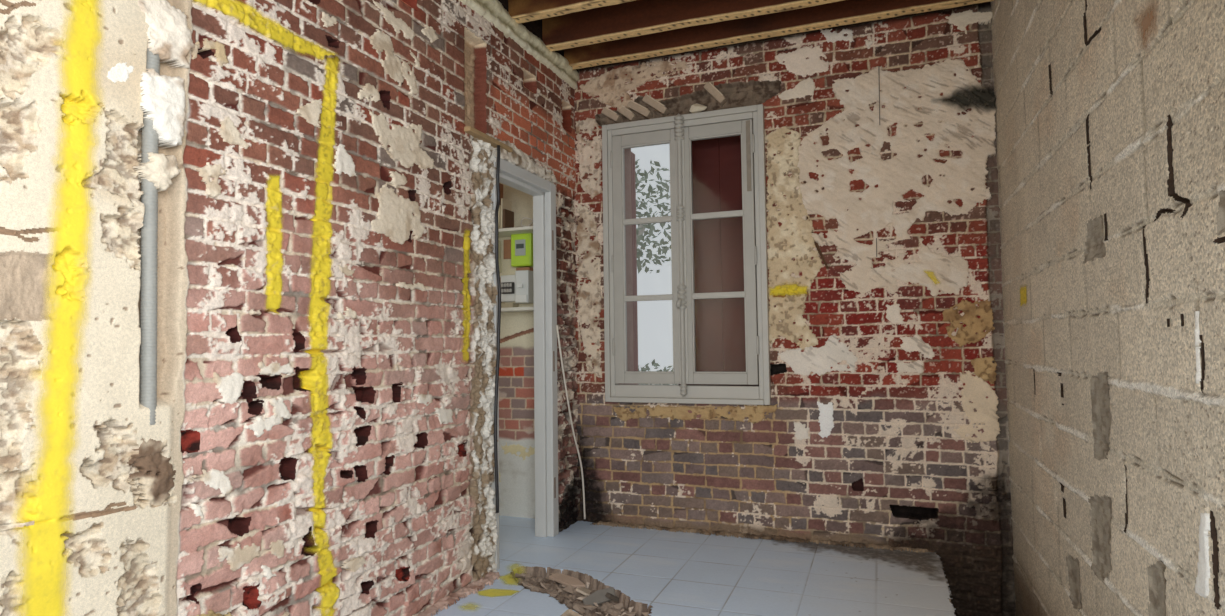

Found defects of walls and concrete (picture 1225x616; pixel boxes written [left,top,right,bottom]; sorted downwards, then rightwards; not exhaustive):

spalling [0,13,66,185]
peeling [358,0,439,245]
peeling [561,100,603,378]
peeling [765,29,996,376]
crack [1046,63,1054,97]
crack [1083,0,1101,46]
crack [1086,114,1108,241]
crack [1142,114,1205,393]
crack [1213,236,1225,244]
peeling [213,329,311,437]
spalling [351,367,376,447]
peeling [217,517,285,610]